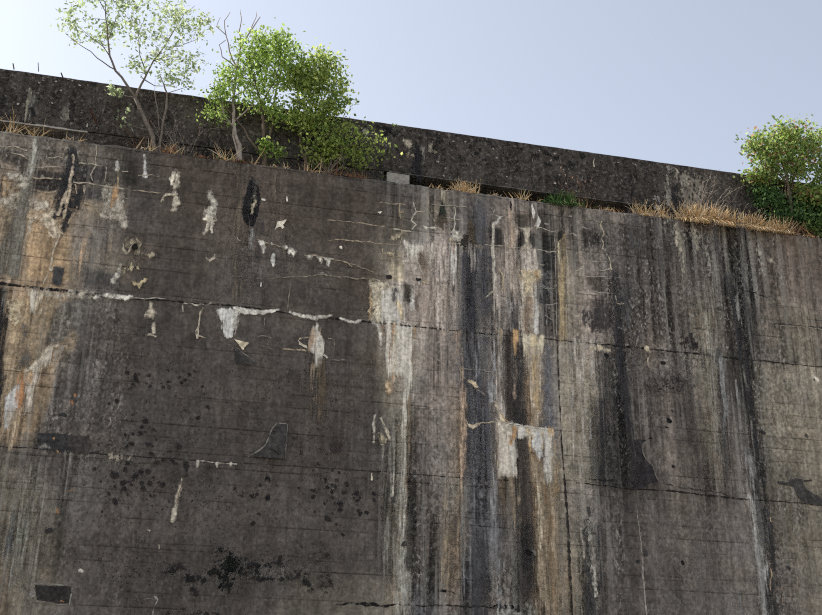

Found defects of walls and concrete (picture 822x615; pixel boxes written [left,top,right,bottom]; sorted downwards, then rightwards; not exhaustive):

water stain [4,465,45,586]
water stain [0,138,85,279]
water stain [0,278,166,451]
water stain [111,263,139,284]
water stain [203,192,217,234]
crack [0,145,436,350]
water stain [210,302,279,338]
water stain [283,281,415,615]
crack [312,317,523,361]
water stain [381,199,558,615]
water stain [570,209,650,615]
water stain [694,219,779,615]